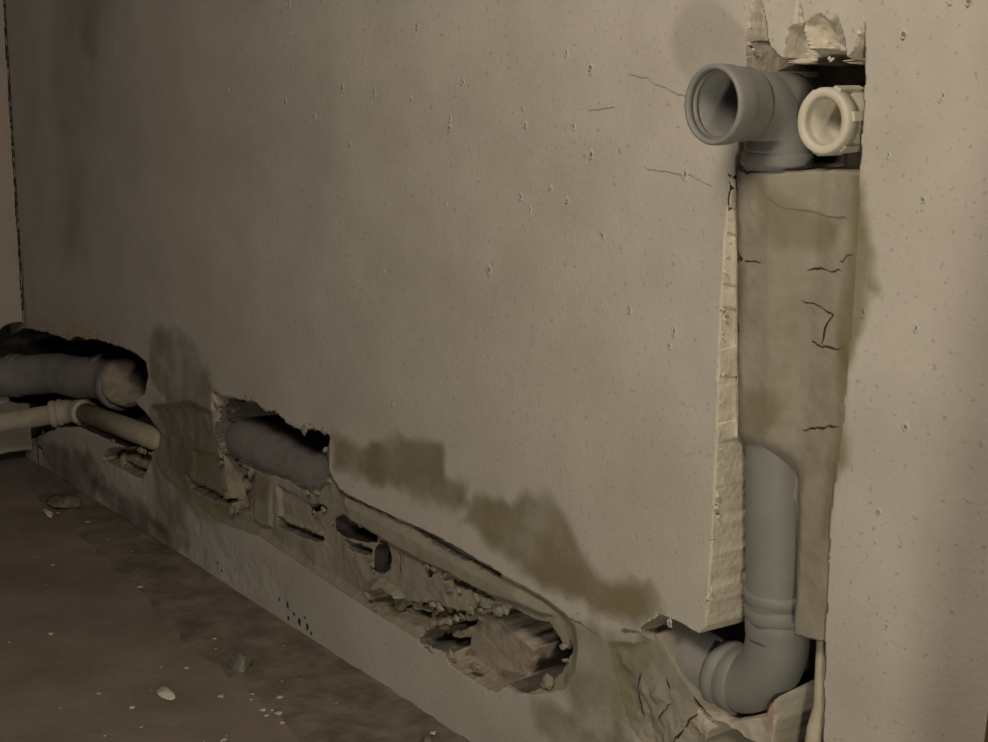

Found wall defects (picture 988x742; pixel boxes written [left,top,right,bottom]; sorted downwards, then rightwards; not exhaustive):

flaking render [747,0,866,66]
crack [807,254,854,272]
spalling [0,322,148,380]
crack [803,301,843,350]
spalling [8,393,79,406]
spalling [60,424,154,480]
spalling [107,396,156,426]
spalling [214,395,391,575]
damp [359,444,463,504]
crack [804,424,838,432]
damp [529,534,647,619]
spalling [363,564,573,694]